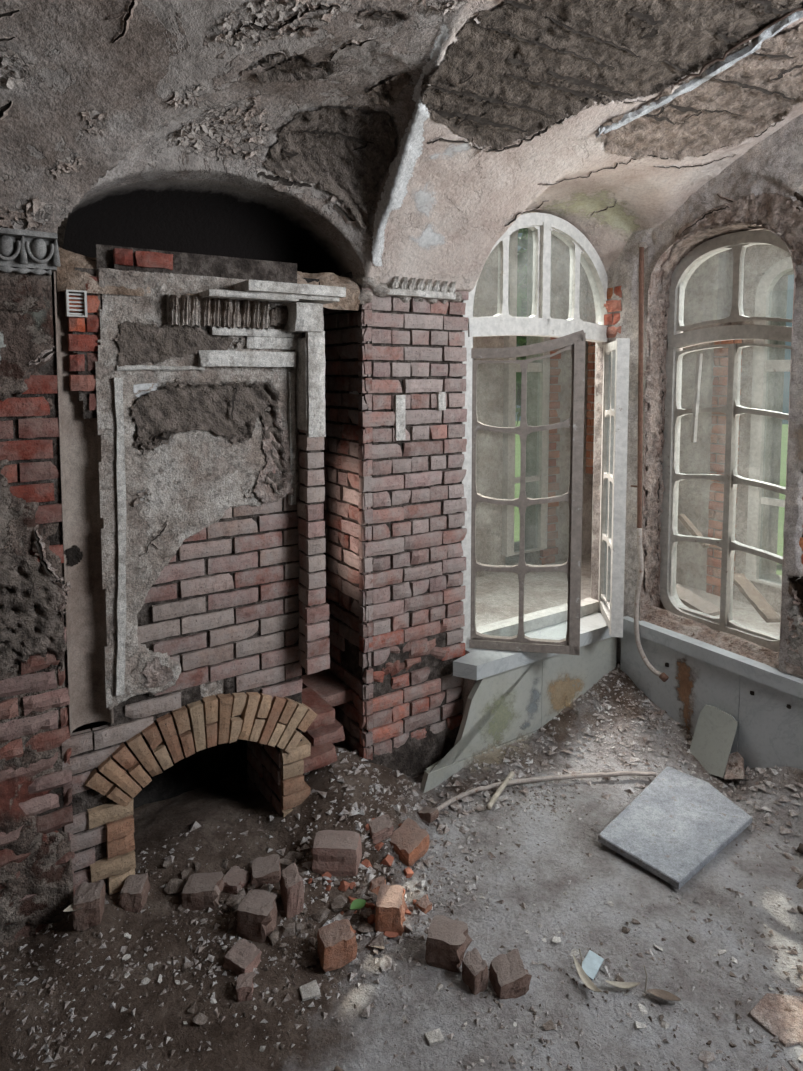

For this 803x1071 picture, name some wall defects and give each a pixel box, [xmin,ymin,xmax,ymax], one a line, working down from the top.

crack [105,0,138,43]
crack [231,2,341,38]
crack [329,38,373,61]
peeling [414,0,468,18]
crack [0,100,13,120]
spalling [166,0,411,235]
crack [504,118,785,226]
spalling [130,378,294,504]
spalling [642,192,803,598]
flaking render [0,267,100,898]
peeling [780,525,803,678]
rust [675,658,694,730]